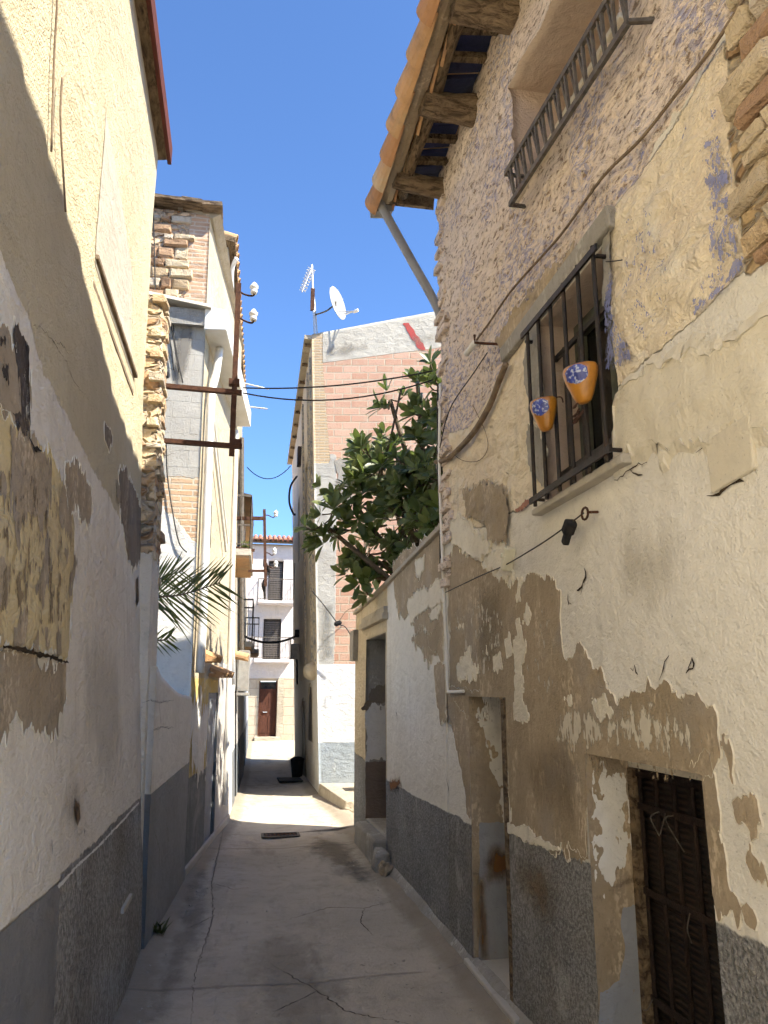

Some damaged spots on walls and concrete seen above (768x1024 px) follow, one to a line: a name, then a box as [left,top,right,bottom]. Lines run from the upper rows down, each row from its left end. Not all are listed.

peeling [0,316,94,747]
peeling [116,464,141,575]
peeling [361,685,385,710]
peeling [393,479,768,932]
crack [191,830,241,1015]
corrosion [479,848,506,956]
crack [273,965,404,1023]